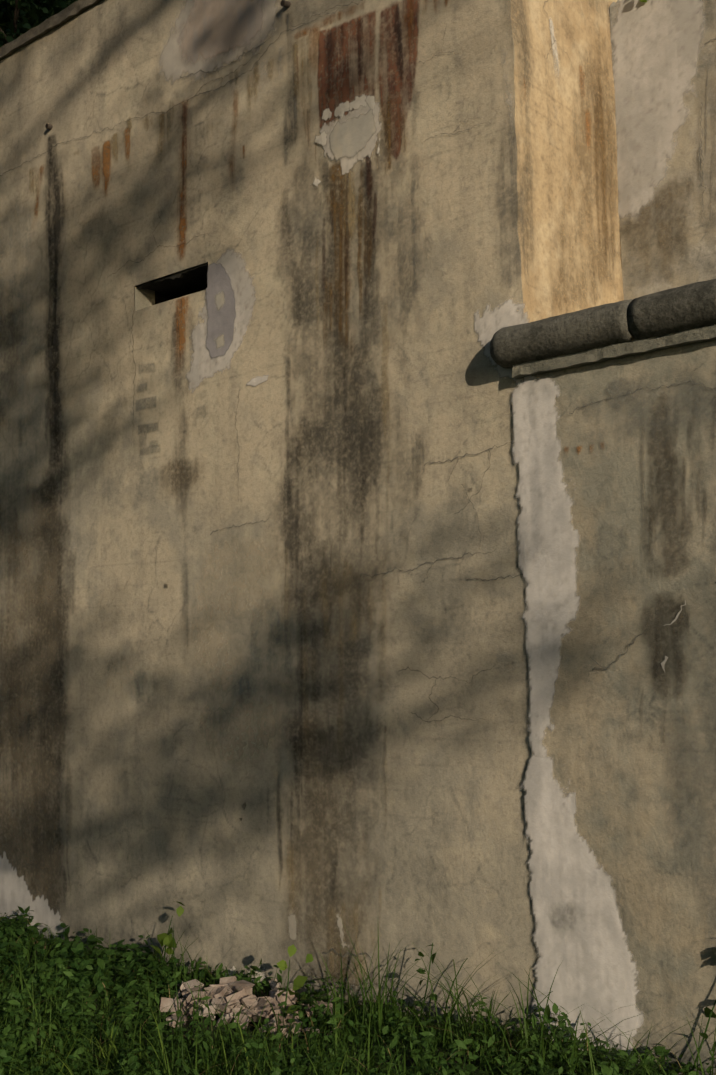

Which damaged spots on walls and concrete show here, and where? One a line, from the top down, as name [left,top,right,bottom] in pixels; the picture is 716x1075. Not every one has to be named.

rust [92,122,130,194]
rust [179,104,187,257]
peeling [315,93,375,146]
rust [330,155,377,343]
rust [293,0,419,168]
damp [0,137,65,901]
damp [646,406,691,574]
damp [644,596,687,696]